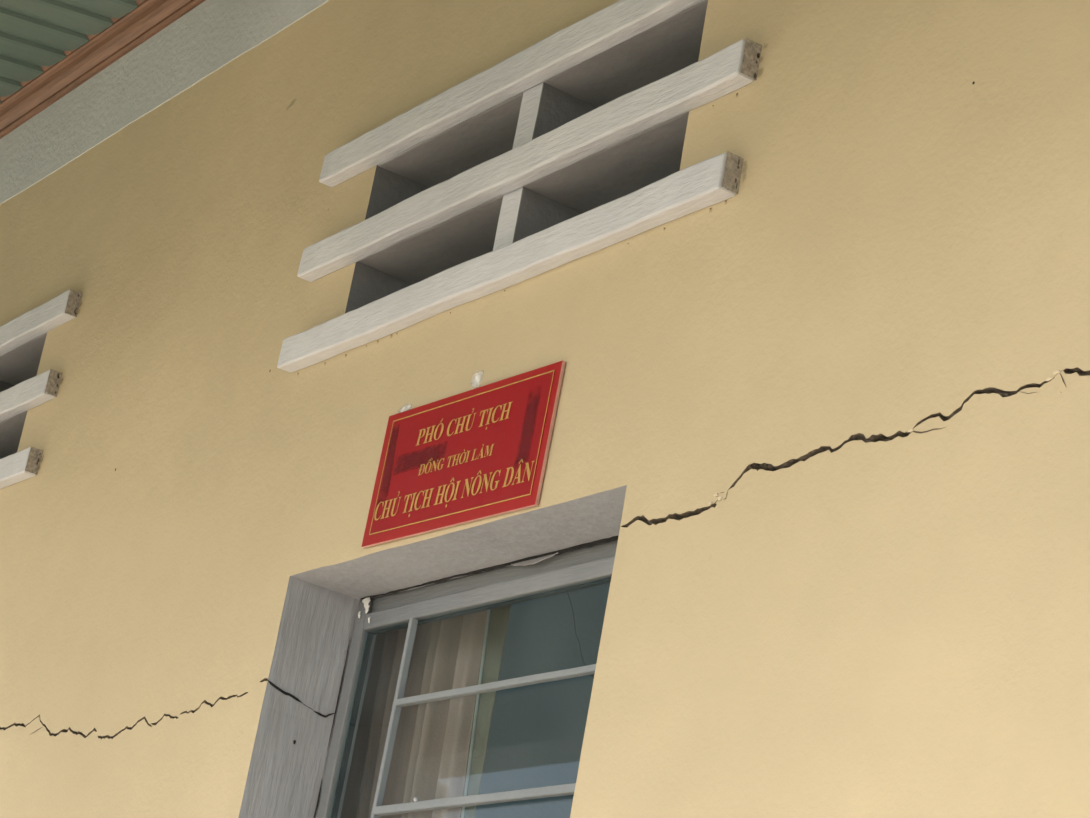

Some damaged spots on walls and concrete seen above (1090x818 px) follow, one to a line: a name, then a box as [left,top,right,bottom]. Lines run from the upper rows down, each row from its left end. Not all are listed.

crack [361,367,1090,599]
crack [0,640,350,751]
crack [314,780,322,818]